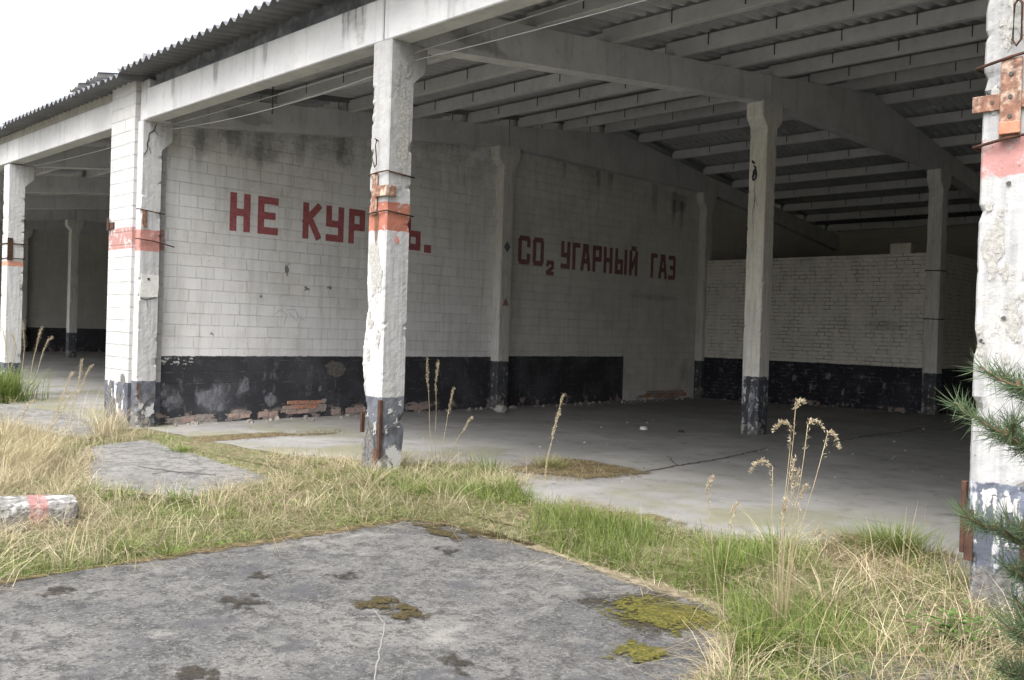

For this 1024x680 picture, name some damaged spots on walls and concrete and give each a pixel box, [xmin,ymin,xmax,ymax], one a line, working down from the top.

peeling [369,239,383,296]
peeling [981,202,1009,282]
flaking render [108,372,429,472]
rust [373,400,383,469]
crack [645,448,765,472]
rust [959,480,974,561]
peeling [972,488,1021,526]